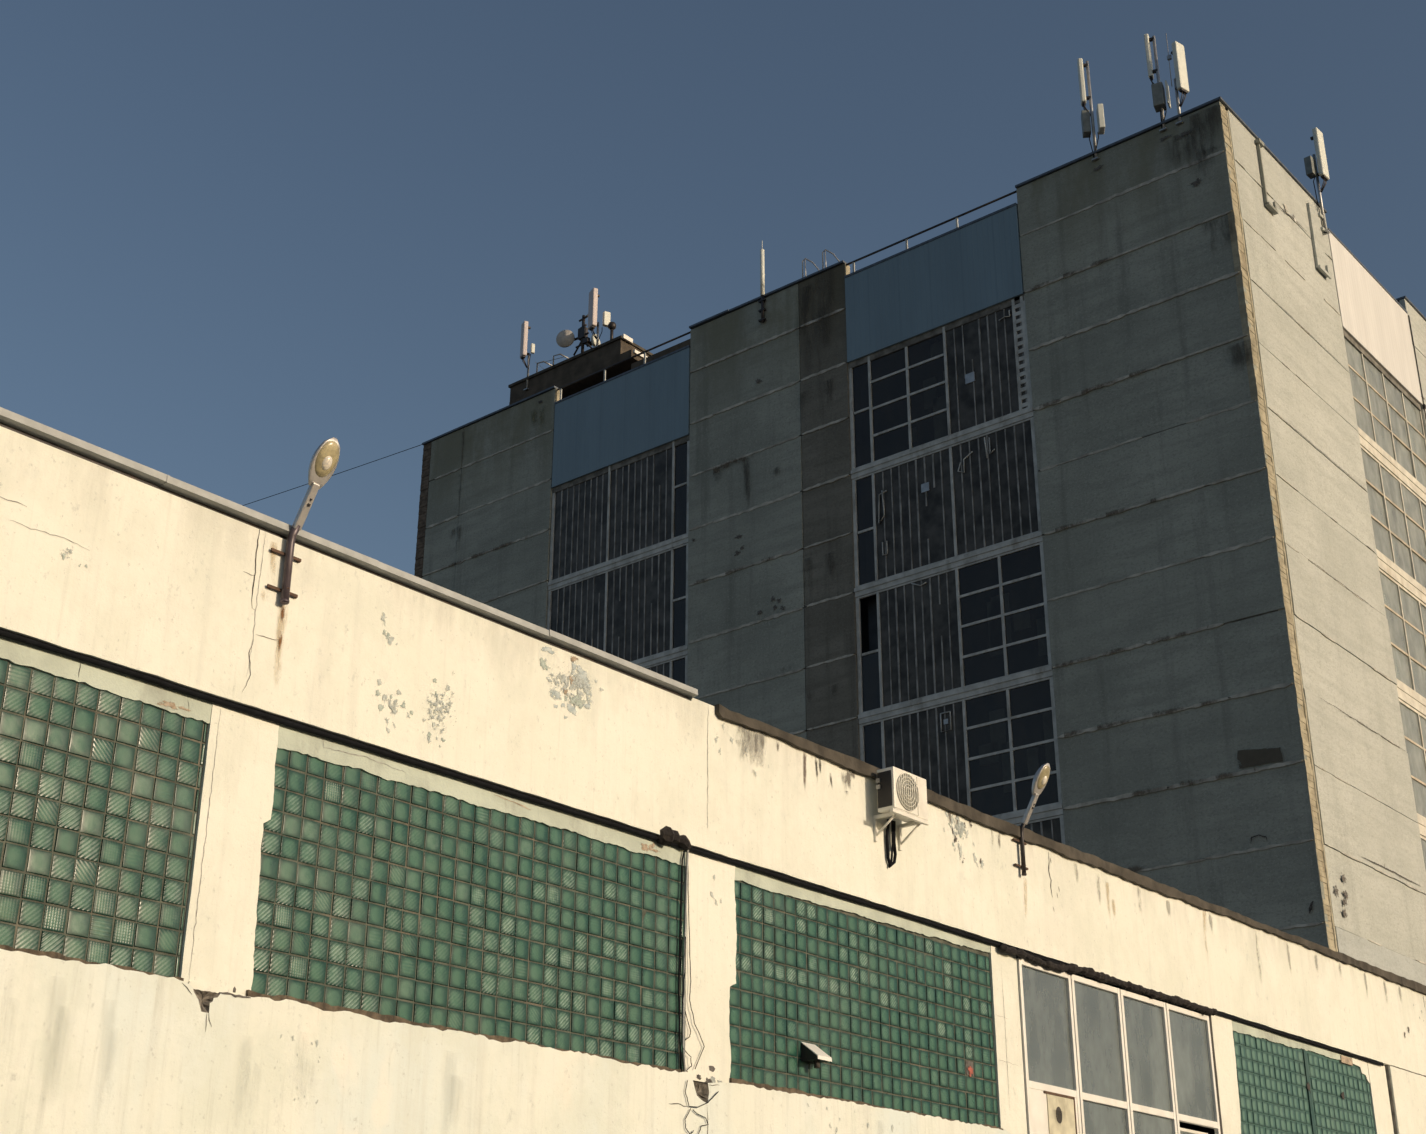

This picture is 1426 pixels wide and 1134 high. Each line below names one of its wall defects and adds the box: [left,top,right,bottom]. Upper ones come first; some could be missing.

crack [0,496,88,550]
peeling [375,678,454,747]
peeling [540,646,603,718]
crack [188,528,274,977]